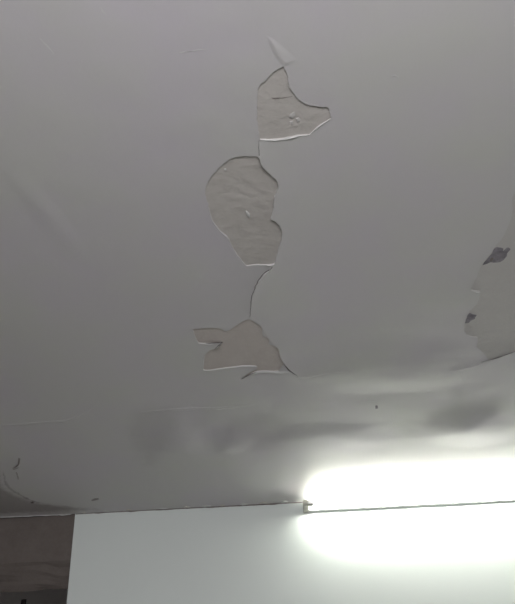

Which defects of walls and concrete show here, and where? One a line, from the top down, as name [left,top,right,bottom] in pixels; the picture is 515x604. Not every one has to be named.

peeling [257,66,331,141]
peeling [205,156,282,267]
peeling [464,192,515,364]
peeling [193,319,297,379]